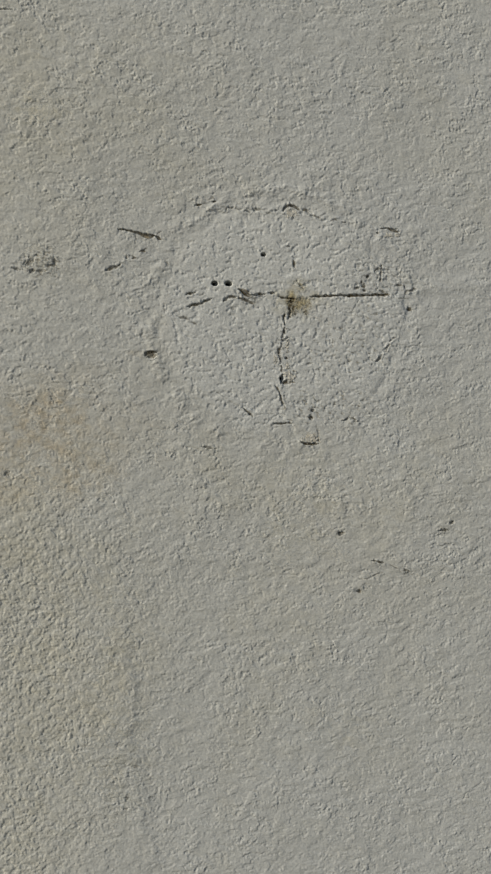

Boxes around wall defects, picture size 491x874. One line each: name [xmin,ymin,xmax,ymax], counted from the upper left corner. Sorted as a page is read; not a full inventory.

crack [293,261,414,298]
crack [185,289,274,324]
crack [274,322,290,425]